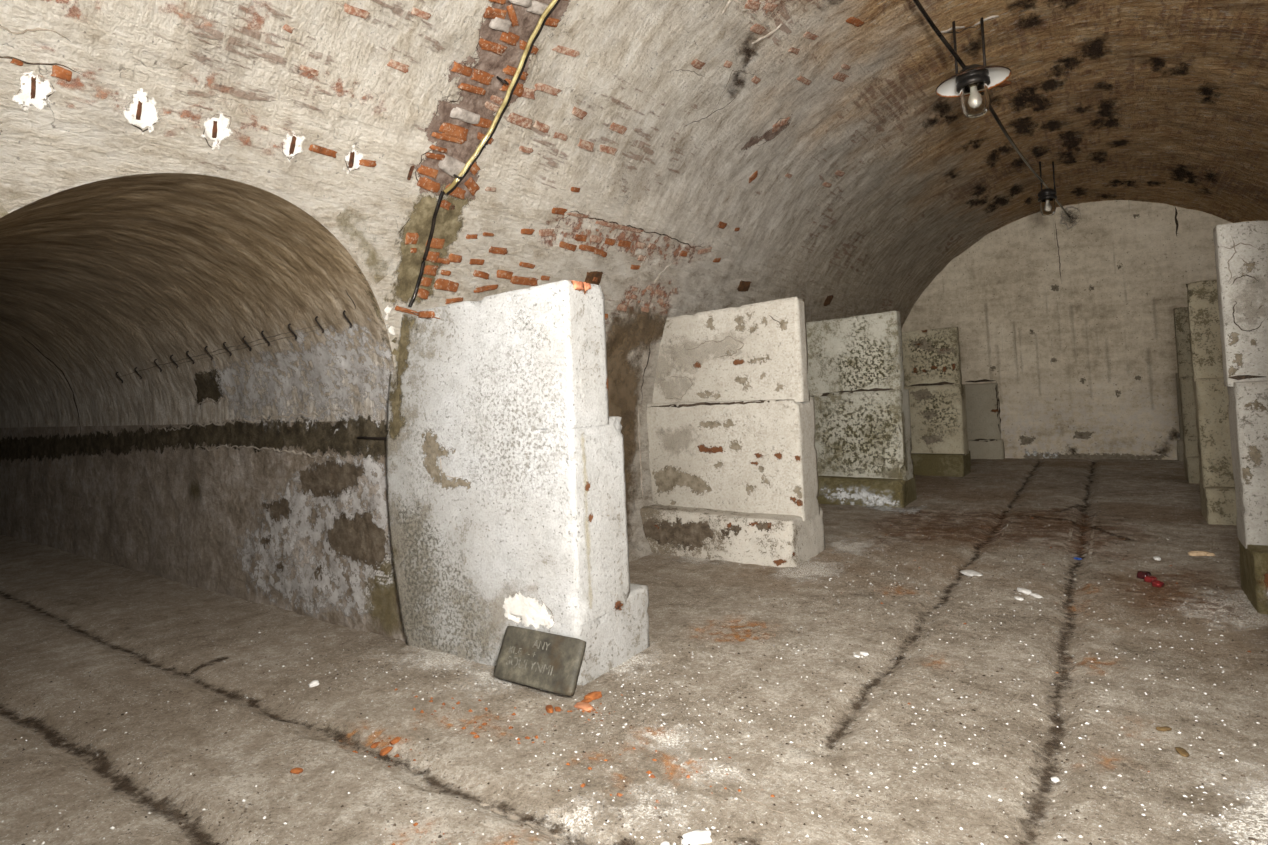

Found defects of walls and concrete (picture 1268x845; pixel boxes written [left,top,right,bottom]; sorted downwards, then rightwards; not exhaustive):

crack [0,25,87,107]
flaking render [414,0,617,202]
flaking render [609,122,627,135]
spalling [570,271,603,294]
crack [1054,224,1062,284]
crack [1173,207,1181,236]
crack [1225,241,1263,332]
flaking render [0,232,550,618]
leakage [606,305,667,542]
spalling [643,461,771,552]
flaking render [699,419,742,452]
leakage [821,417,926,514]